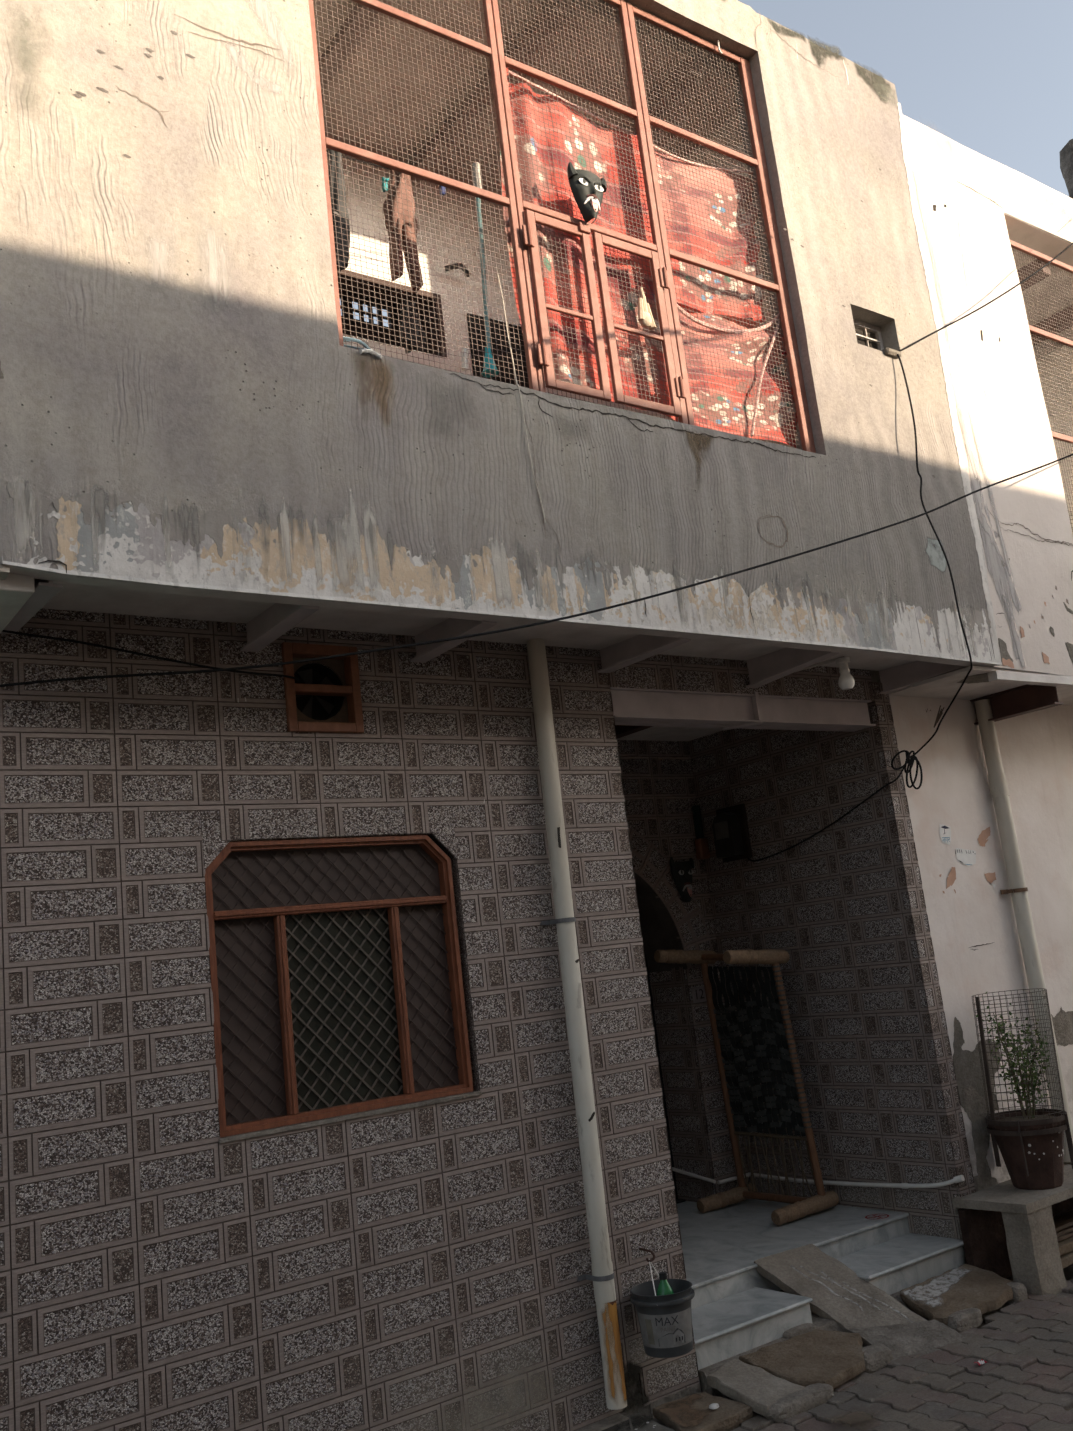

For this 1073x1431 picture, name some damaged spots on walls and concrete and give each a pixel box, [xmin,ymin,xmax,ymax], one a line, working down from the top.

peeling [6,482,1073,684]
peeling [939,867,956,894]
peeling [977,827,991,847]
corrosion [602,1300,627,1401]